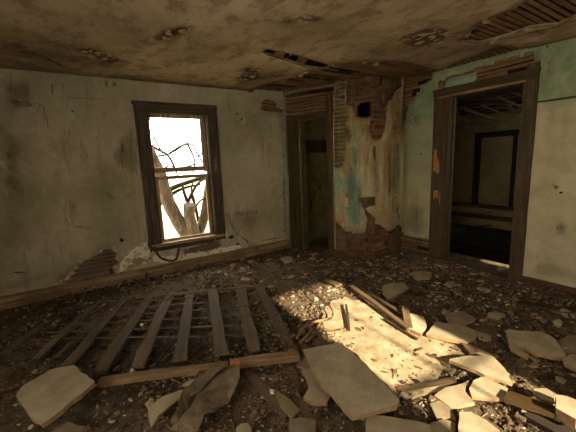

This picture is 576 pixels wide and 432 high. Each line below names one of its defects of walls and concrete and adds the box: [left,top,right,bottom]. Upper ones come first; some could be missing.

spalling [248,0,576,169]
spalling [57,232,242,283]
spalling [334,196,429,258]